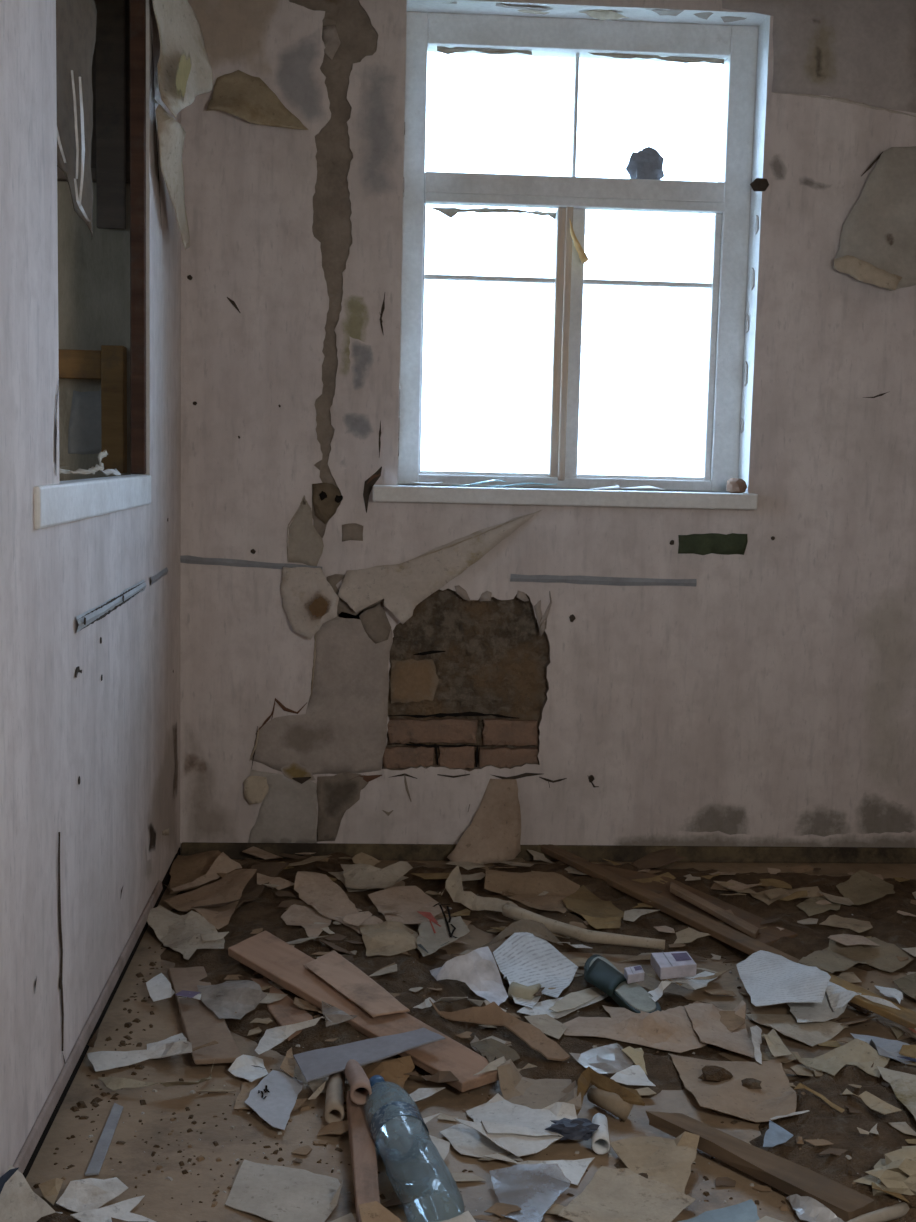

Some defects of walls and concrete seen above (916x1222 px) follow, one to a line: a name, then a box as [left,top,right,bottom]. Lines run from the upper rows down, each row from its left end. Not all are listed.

spalling [152,0,378,542]
spalling [250,510,550,867]
crack [35,832,65,1063]